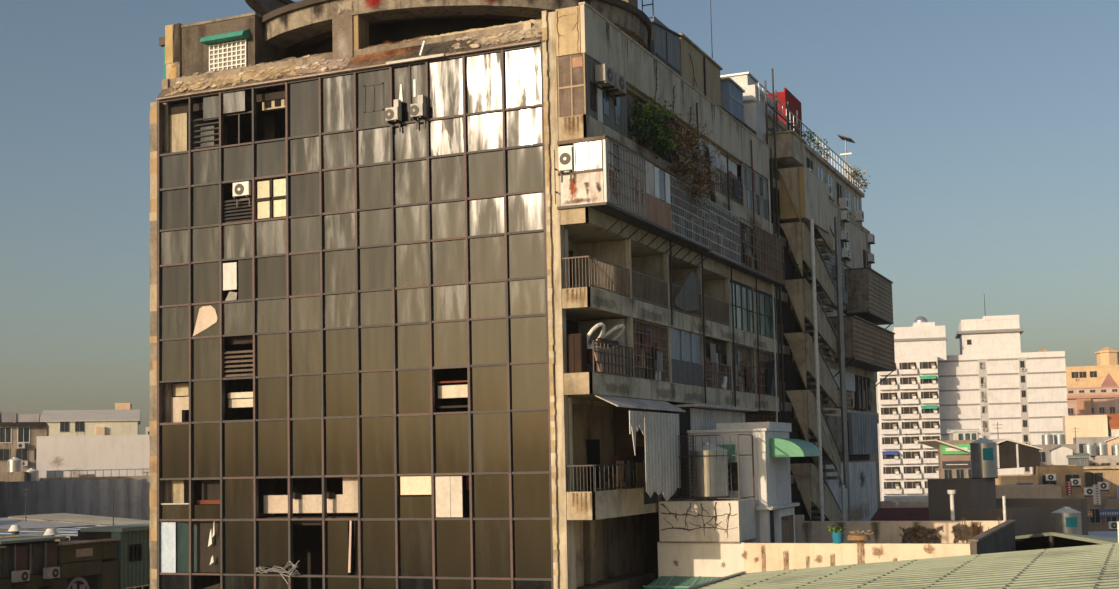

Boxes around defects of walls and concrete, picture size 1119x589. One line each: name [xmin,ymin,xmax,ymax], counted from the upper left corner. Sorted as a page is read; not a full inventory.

rust [570,171,617,203]
crack [661,502,738,538]
water stain [858,523,882,564]
water stain [899,522,983,554]